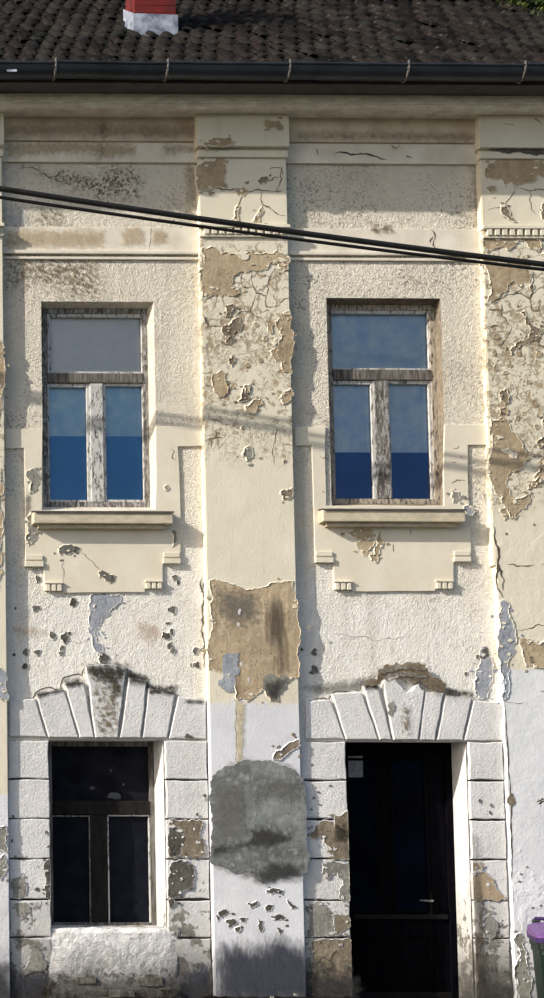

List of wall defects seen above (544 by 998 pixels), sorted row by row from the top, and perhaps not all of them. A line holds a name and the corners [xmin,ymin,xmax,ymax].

crack [316,145,412,160]
peeling [479,235,544,306]
peeling [193,246,297,430]
peeling [481,387,544,521]
crack [493,527,541,597]
spalling [69,569,125,664]
peeling [189,577,319,703]
spalling [167,813,206,909]
water stain [214,786,287,853]
water stain [259,863,299,882]
spalling [215,810,352,997]
water stain [58,939,306,998]